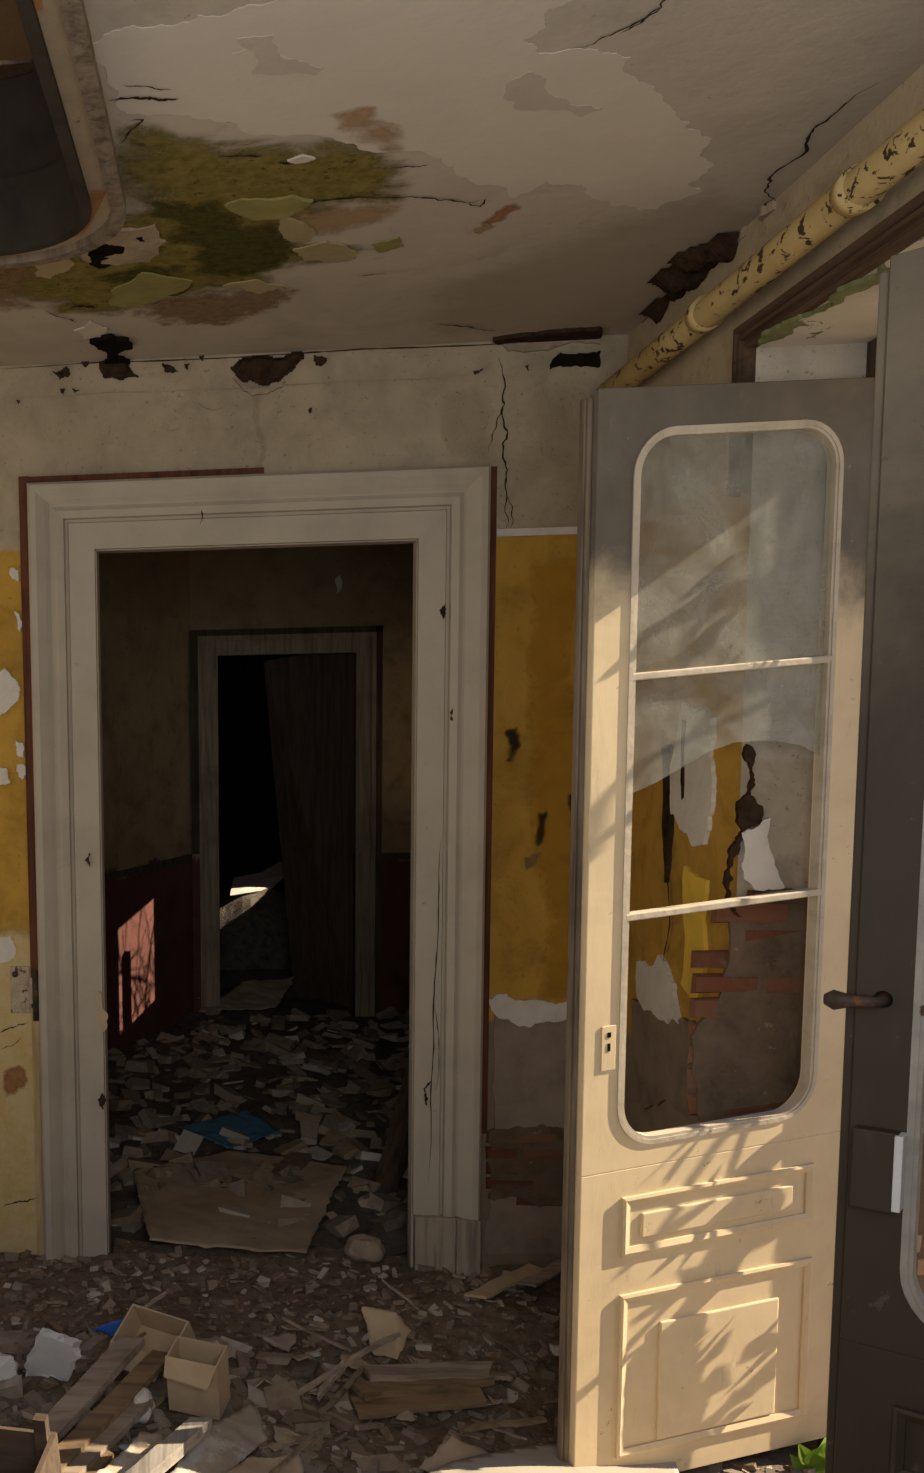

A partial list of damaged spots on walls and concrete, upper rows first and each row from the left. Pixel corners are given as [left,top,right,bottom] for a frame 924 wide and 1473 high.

crack [571,0,666,49]
peeling [93,0,714,211]
crack [764,83,878,206]
flaking render [35,224,193,310]
leakage [0,108,403,325]
spalling [639,199,776,324]
spalling [52,321,139,395]
crack [7,324,514,529]
spalling [230,351,327,396]
peeling [0,669,21,716]
peeling [0,740,26,785]
peeling [484,993,567,1257]